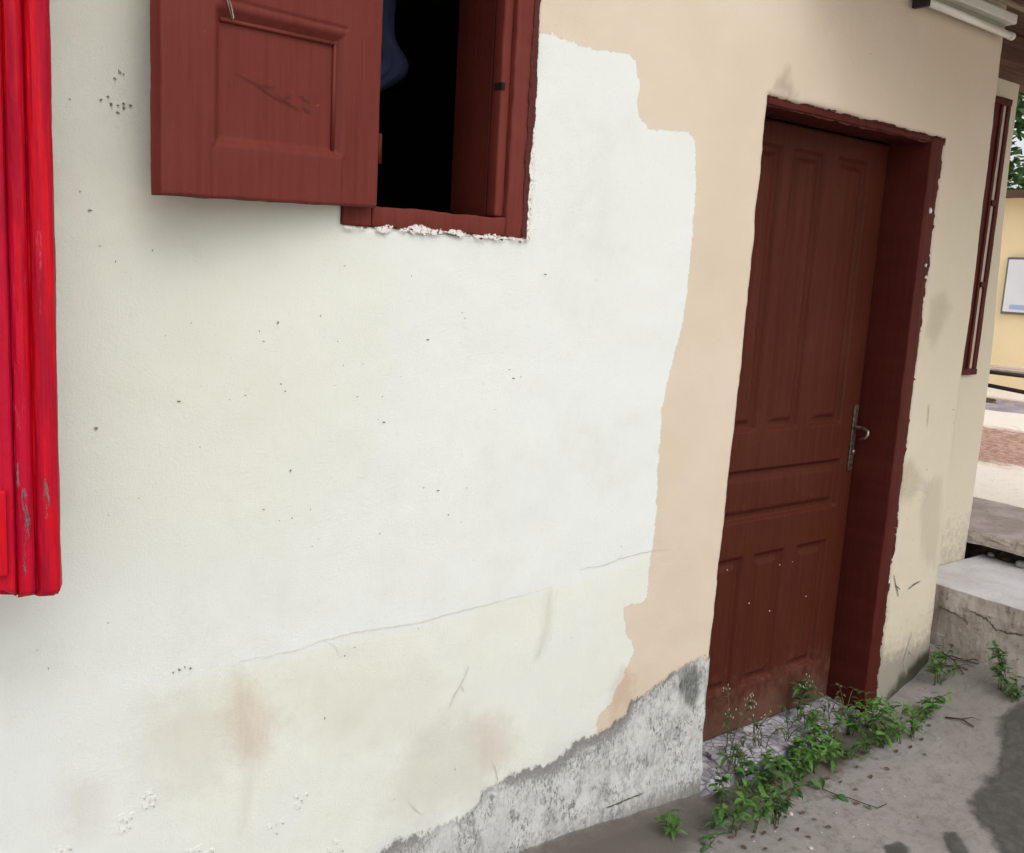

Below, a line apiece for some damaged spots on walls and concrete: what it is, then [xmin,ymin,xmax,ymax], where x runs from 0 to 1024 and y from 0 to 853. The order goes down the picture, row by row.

peeling [343,0,541,243]
crack [239,586,553,662]
crack [938,606,1023,636]
flaking render [380,655,710,853]